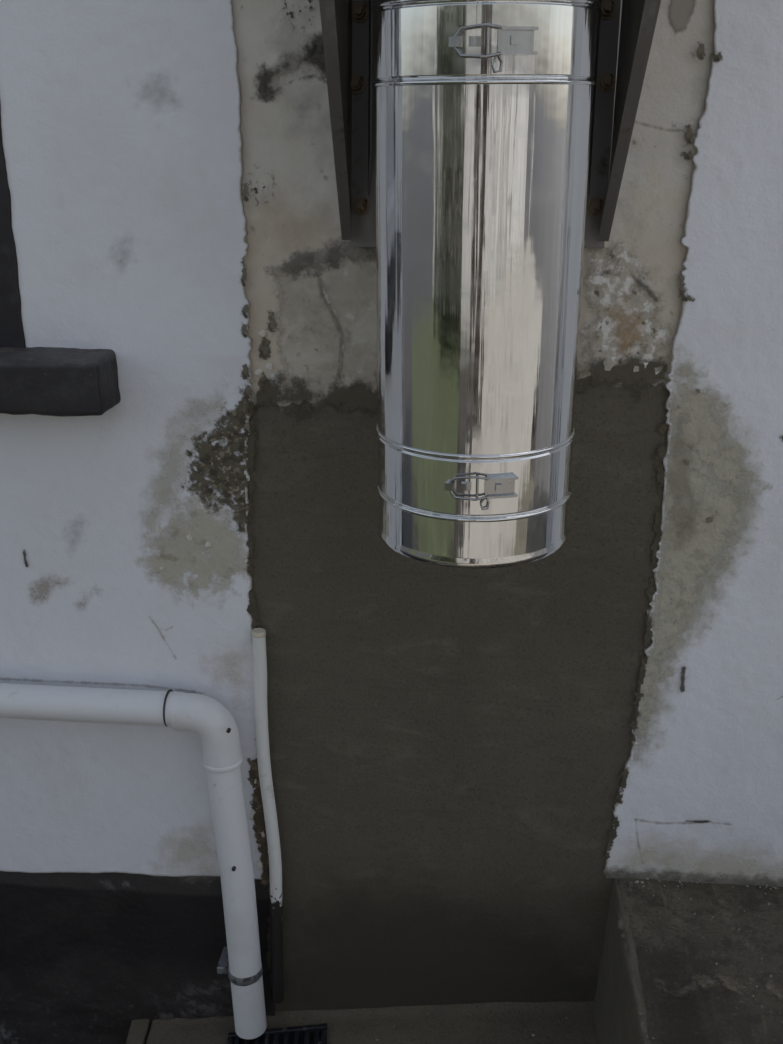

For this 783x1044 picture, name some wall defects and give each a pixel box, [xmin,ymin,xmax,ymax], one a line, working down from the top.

flaking render [142,0,377,597]
flaking render [577,0,754,738]